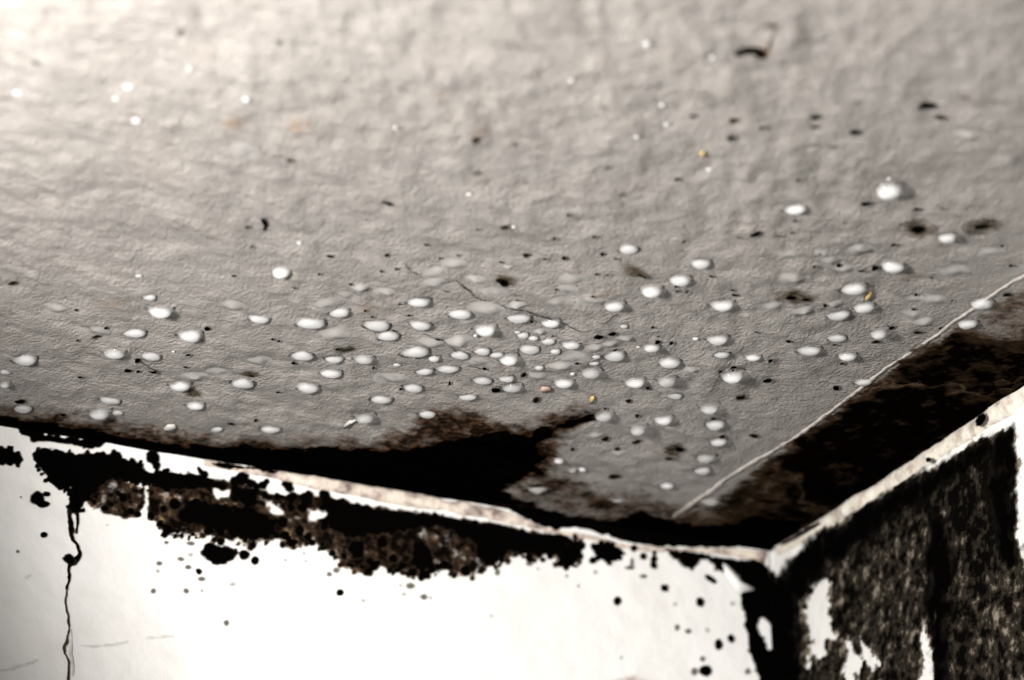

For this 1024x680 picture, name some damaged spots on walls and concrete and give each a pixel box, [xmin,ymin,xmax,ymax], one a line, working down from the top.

mould [0,293,1024,680]